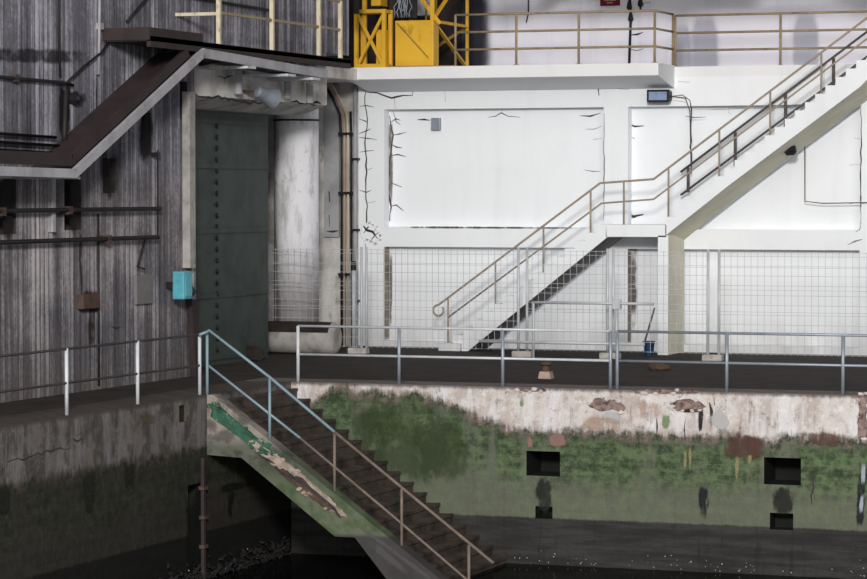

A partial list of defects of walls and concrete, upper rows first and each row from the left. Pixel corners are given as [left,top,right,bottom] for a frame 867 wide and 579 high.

crack [359,91,430,247]
spalling [586,396,626,414]
spalling [633,388,706,413]
water stain [684,409,729,431]
spalling [855,392,867,441]
peeling [207,401,346,517]
corrosion [725,432,763,479]
corrosion [809,433,838,446]
water stain [536,479,551,511]
water stain [699,488,709,514]